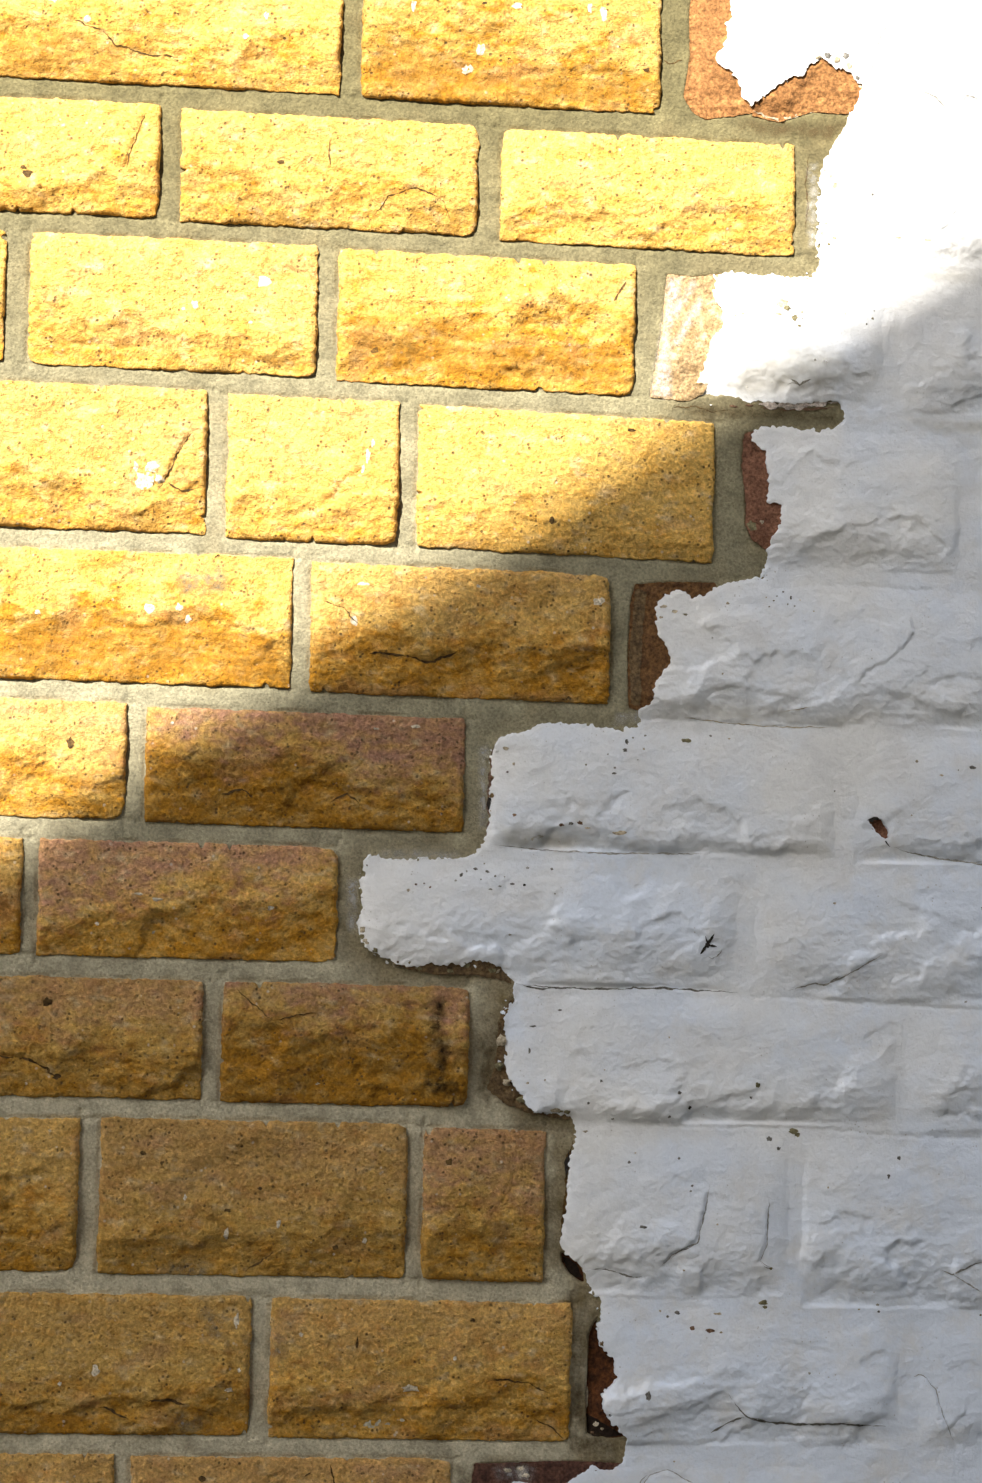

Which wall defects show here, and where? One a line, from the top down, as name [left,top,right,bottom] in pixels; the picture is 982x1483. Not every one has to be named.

peeling [684,0,862,122]
peeling [650,274,804,401]
peeling [729,401,838,411]
peeling [741,431,782,549]
peeling [627,582,717,710]
spalling [486,737,515,835]
spalling [356,854,571,1120]
peeling [585,1285,624,1438]
peeling [472,1460,621,1483]